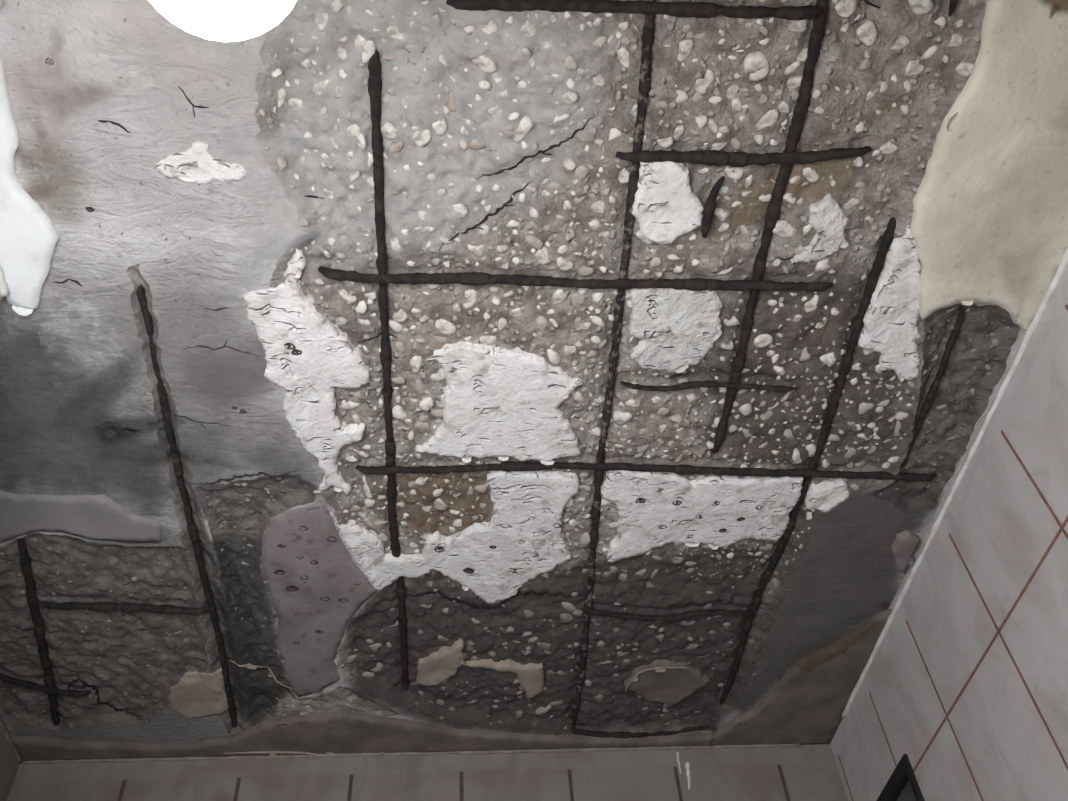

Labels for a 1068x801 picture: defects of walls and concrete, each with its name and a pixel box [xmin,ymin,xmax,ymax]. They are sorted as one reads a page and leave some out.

crack [97,120,130,133]
crack [178,86,209,119]
flaking render [0,57,60,316]
crack [439,114,595,250]
rust [735,149,848,224]
spalling [254,0,1068,726]
rust [385,477,491,533]